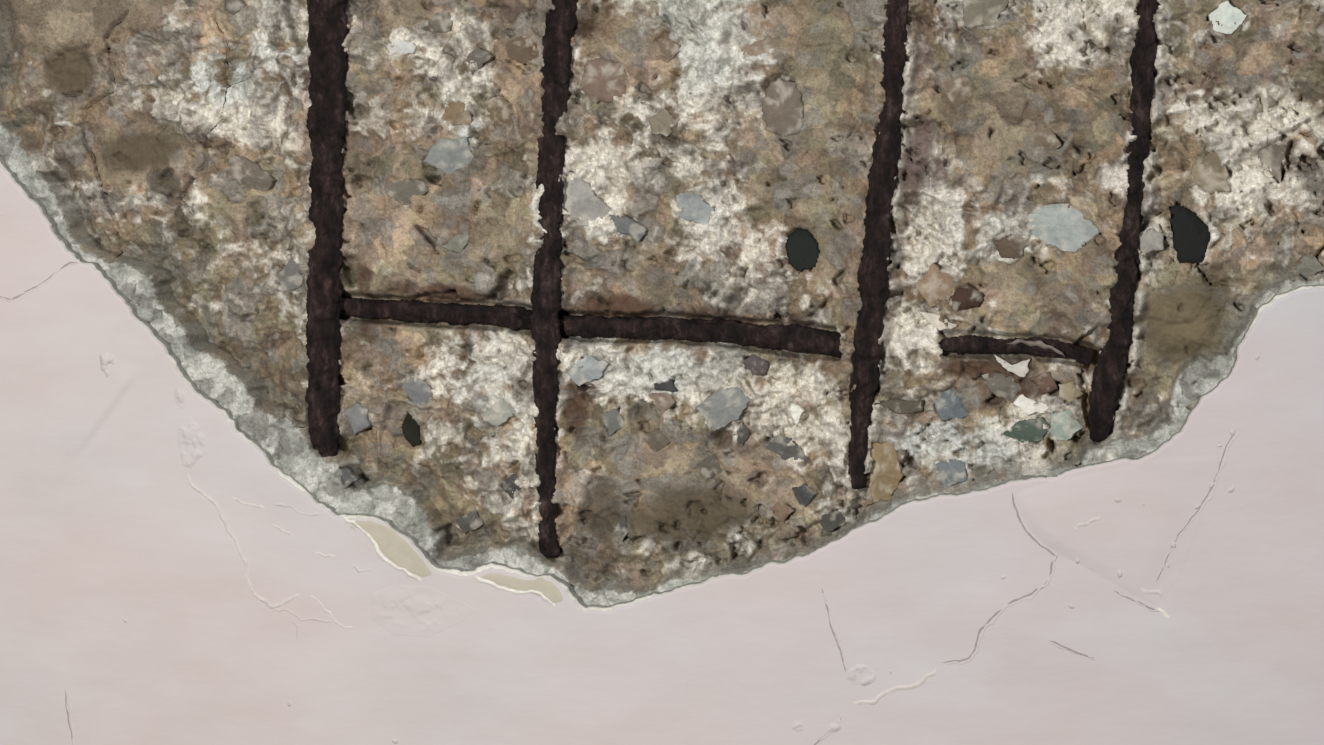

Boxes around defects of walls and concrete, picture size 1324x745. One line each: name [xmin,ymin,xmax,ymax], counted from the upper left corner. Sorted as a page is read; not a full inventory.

corrosion [904,114,946,193]
spalling [0,0,321,456]
crack [0,260,80,302]
corrosion [395,284,481,303]
corrosion [560,295,660,318]
spalling [323,0,1324,593]
spalling [0,122,1049,611]
corrosion [943,359,1035,395]
corrosion [1007,339,1065,356]
crack [1115,432,1240,612]
crack [942,494,1059,665]
crack [1048,640,1096,660]